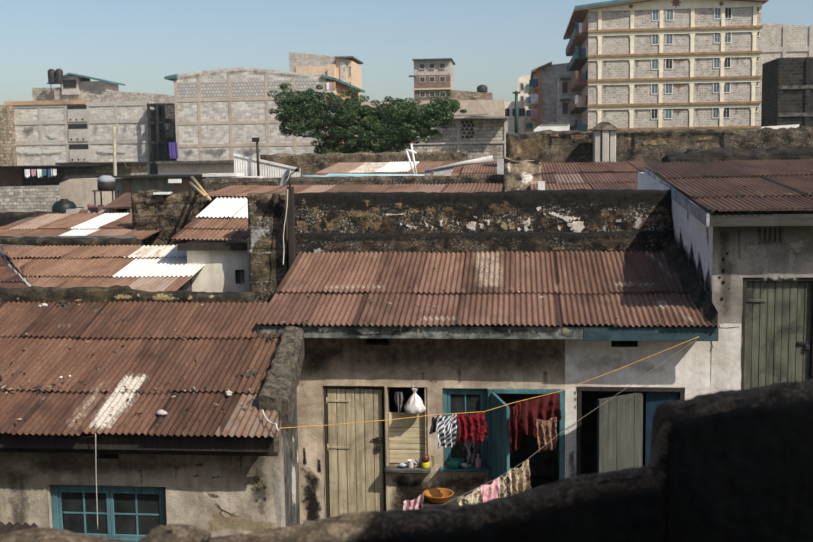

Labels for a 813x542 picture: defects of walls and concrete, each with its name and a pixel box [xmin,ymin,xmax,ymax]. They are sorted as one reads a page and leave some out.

peeling [456,216,490,231]
peeling [537,206,585,232]
water stain [671,208,712,302]
water stain [302,448,321,521]